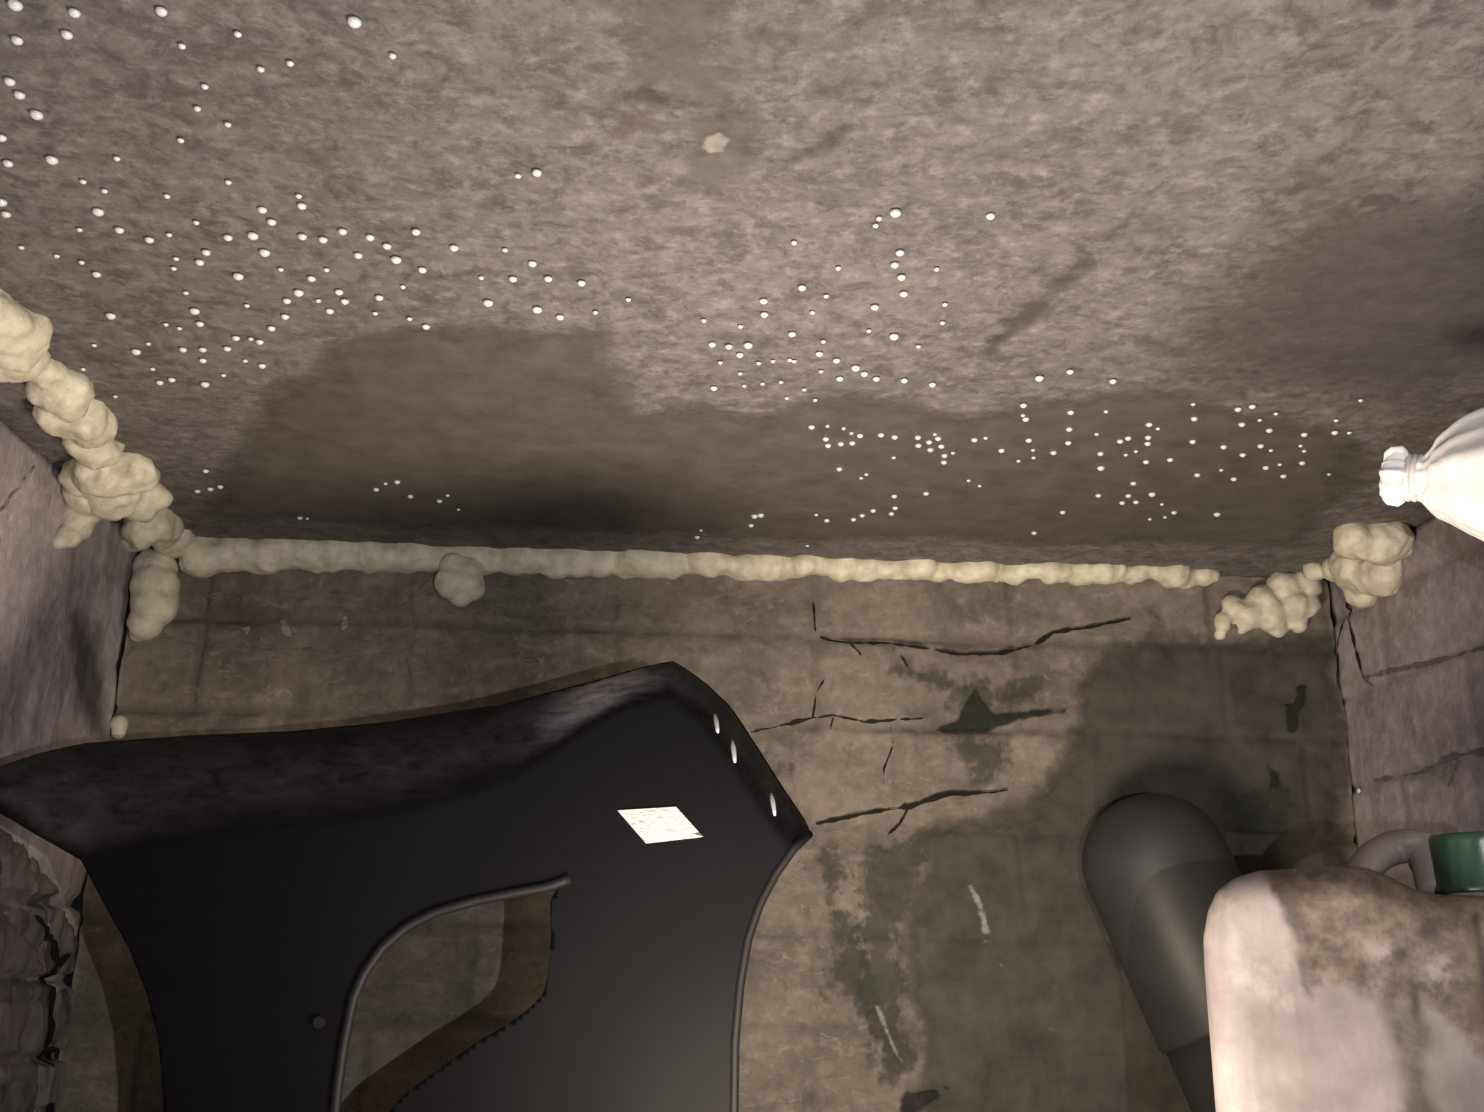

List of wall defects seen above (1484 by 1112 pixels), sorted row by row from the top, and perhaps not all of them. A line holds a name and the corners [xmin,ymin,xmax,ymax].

leakage [213,331,1355,545]
crack [812,603,1131,669]
crack [1336,597,1484,687]
leakage [897,669,1038,710]
crack [750,679,1008,835]
leakage [958,741,1010,785]
crack [1374,748,1484,787]
leakage [969,886,990,942]
leakage [832,839,926,1083]